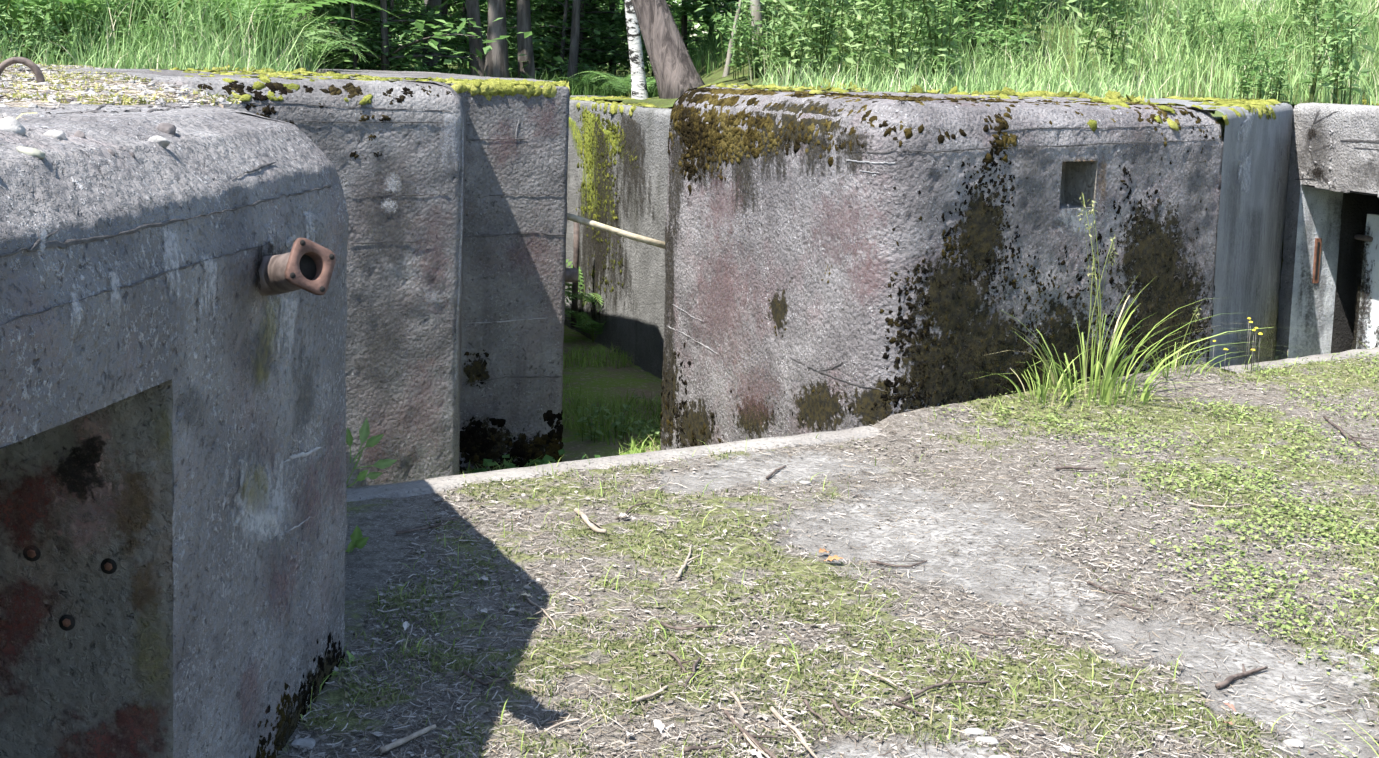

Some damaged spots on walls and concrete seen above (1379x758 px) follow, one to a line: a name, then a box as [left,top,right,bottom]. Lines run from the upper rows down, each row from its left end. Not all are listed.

damp [1059,158,1106,232]